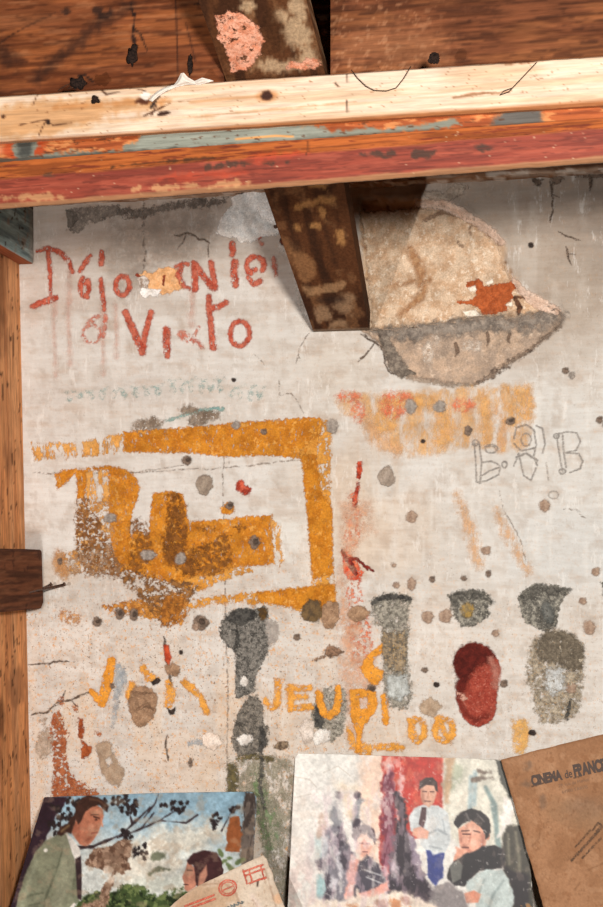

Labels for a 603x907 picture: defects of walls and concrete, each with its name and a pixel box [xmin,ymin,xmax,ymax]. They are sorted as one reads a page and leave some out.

flaking render [360,183,564,388]